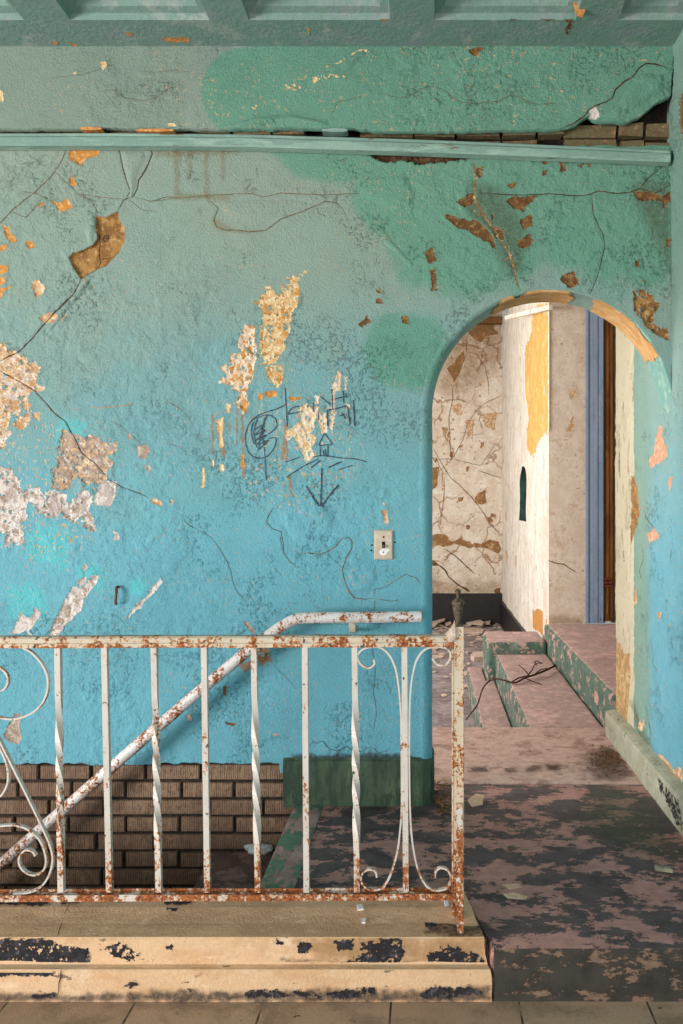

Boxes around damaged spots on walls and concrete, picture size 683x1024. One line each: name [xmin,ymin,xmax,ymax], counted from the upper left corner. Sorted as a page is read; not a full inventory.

crack [331,63,666,128]
flaking render [345,92,683,147]
crack [0,150,360,232]
crack [472,162,670,293]
peeling [0,341,46,450]
crack [1,235,147,497]
peeling [0,428,152,549]
peeling [215,271,350,463]
crack [433,339,501,534]
peeling [467,270,580,458]
peeling [589,259,670,363]
peeling [0,938,139,977]